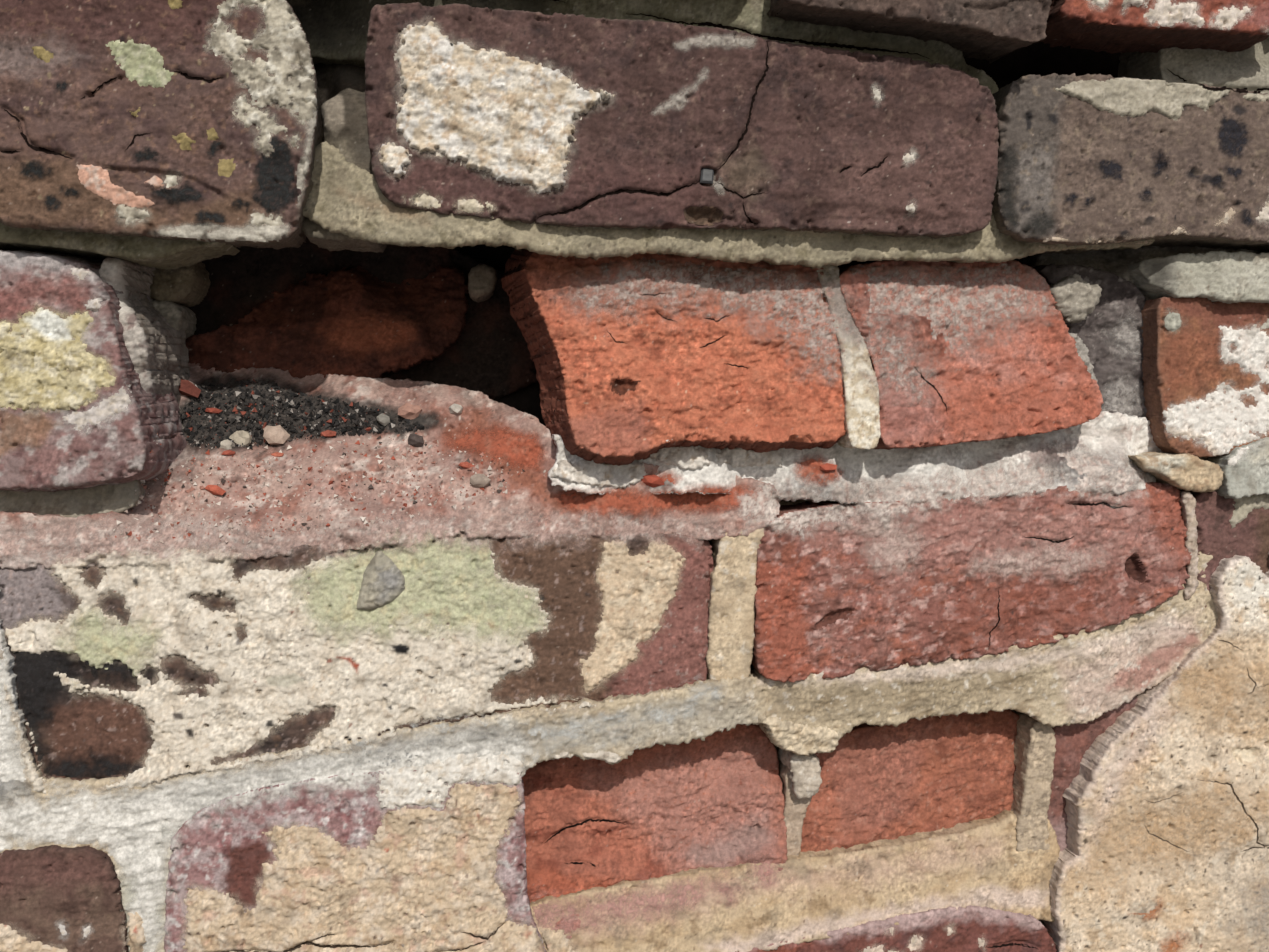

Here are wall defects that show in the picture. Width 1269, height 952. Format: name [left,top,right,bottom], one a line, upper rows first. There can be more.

crack [537,13,930,224]
peeling [1229,494,1269,528]
spalling [1125,554,1148,585]
flaking render [0,527,686,794]
crack [1144,780,1269,852]
crack [222,934,393,952]
crack [443,922,506,951]